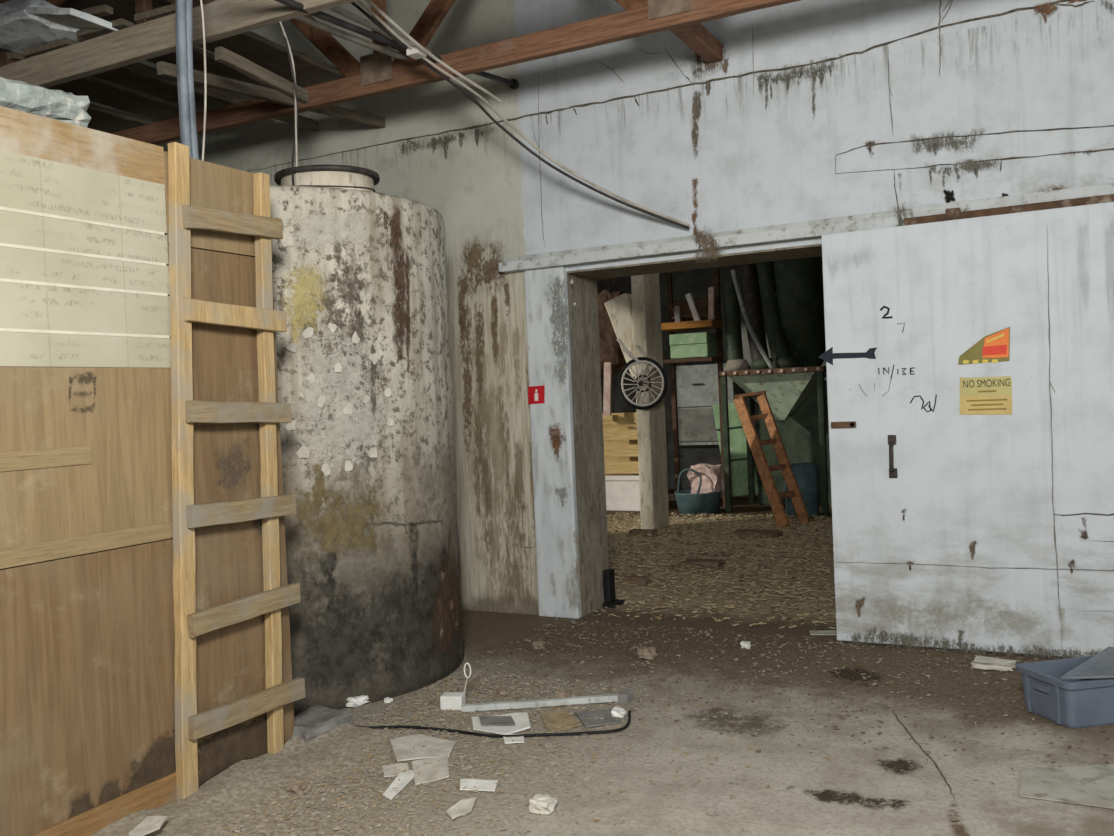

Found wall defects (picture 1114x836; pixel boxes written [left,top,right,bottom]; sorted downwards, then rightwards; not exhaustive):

water stain [758,62,834,113]
water stain [401,128,483,159]
water stain [913,132,996,187]
corrosion [384,208,410,371]
water stain [458,244,510,450]
corrosion [549,425,564,458]
water stain [297,464,462,690]
crack [869,700,958,804]